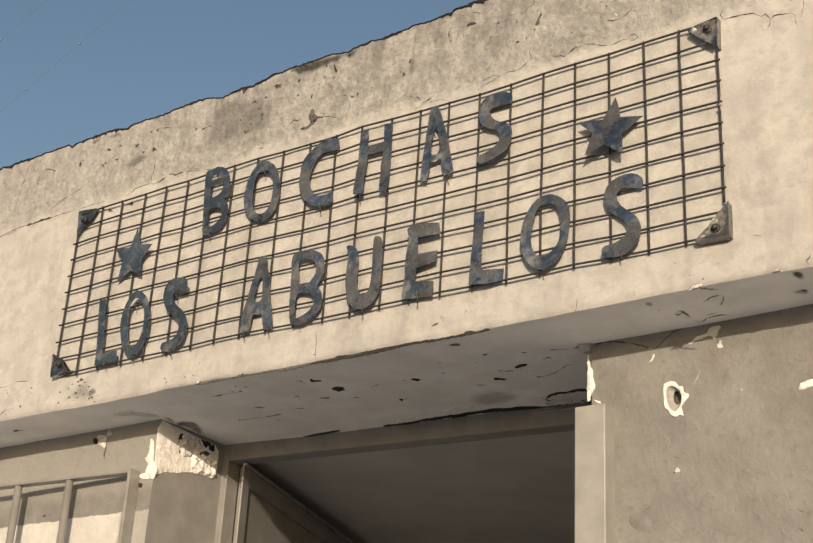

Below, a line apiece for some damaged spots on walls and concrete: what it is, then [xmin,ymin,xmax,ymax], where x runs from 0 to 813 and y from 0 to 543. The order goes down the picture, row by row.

crack [706,0,804,30]
flaking render [301,109,323,130]
crack [0,188,105,237]
crack [542,295,724,377]
peeling [689,325,723,348]
flaking render [525,354,601,406]
spalling [663,381,689,417]
peeling [799,379,813,390]
peeling [368,405,474,425]
crack [383,406,552,427]
crack [304,429,340,437]
peeling [114,411,219,488]